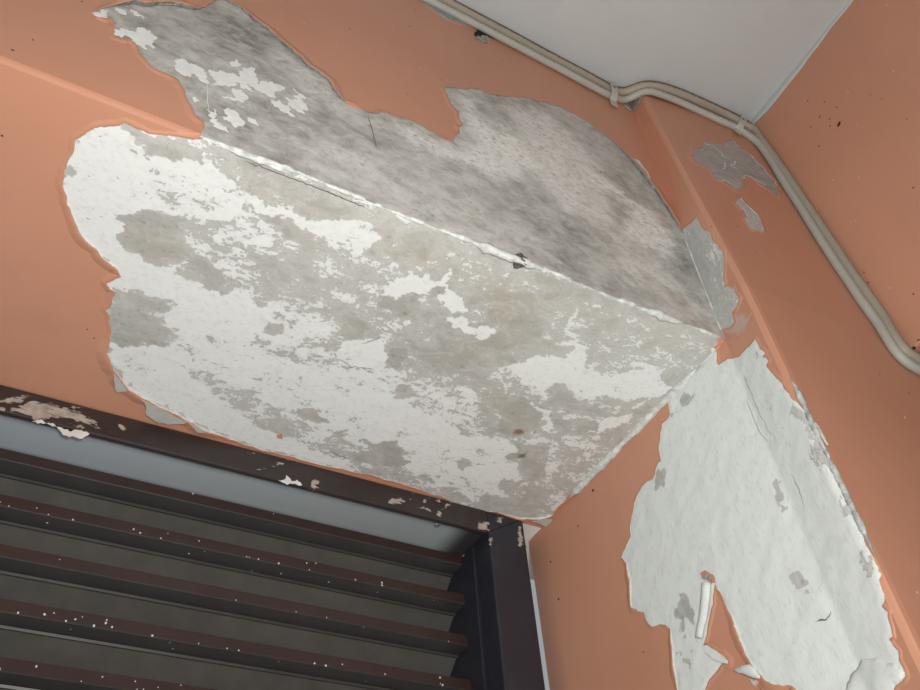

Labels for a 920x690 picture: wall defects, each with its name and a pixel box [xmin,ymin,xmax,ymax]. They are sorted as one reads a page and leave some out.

peeling [55,0,743,527]
peeling [687,139,783,235]
peeling [621,336,910,690]